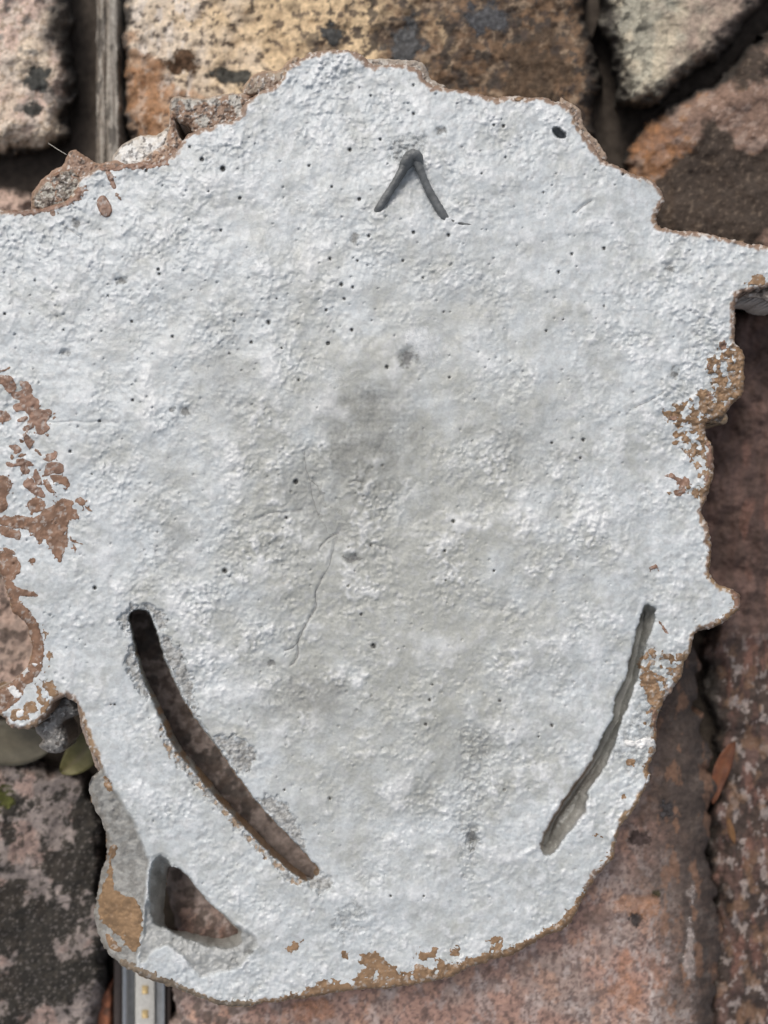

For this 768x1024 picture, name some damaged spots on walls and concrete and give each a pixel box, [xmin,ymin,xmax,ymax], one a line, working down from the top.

peeling [744,274,766,287]
peeling [0,366,92,722]
crack [285,452,363,666]
peeling [662,340,745,579]
peeling [703,589,740,629]
peeling [621,647,685,803]
peeling [94,833,616,1007]